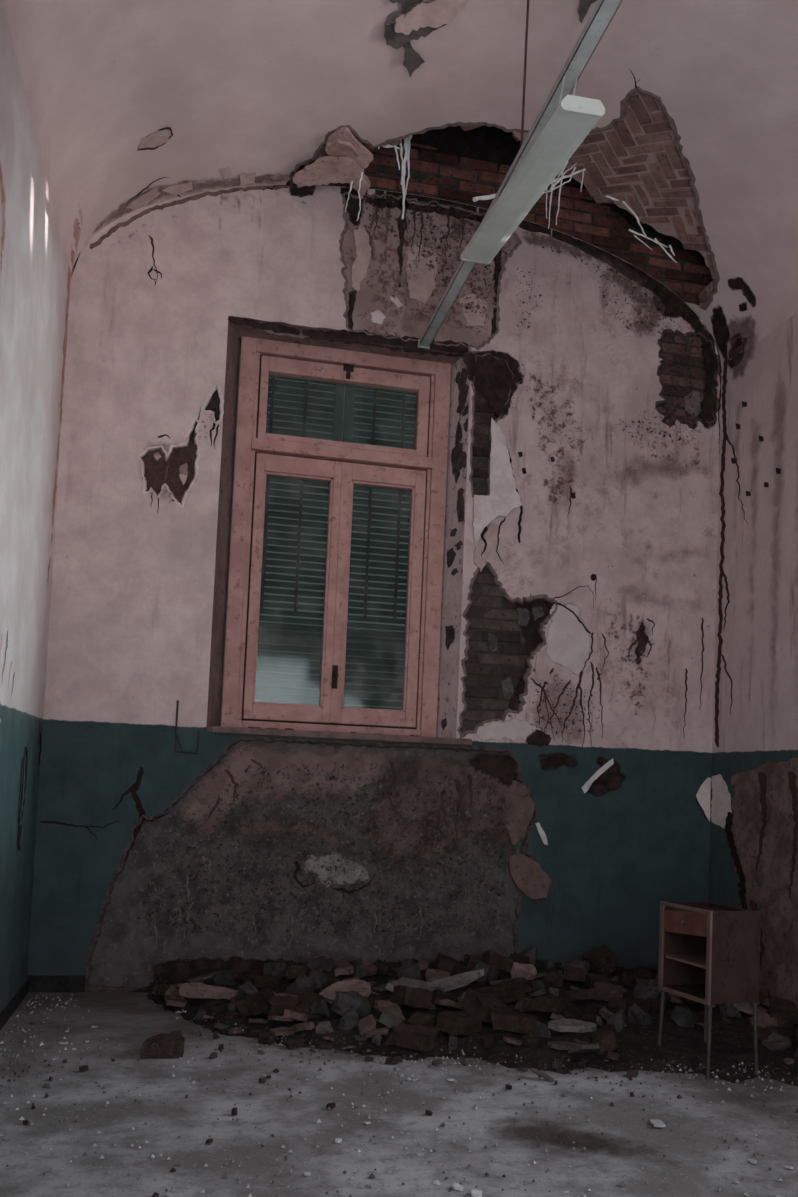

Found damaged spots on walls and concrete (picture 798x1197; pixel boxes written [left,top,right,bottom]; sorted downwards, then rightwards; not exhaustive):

peeling [384,0,469,77]
peeling [578,0,597,24]
spalling [524,86,720,310]
rust [60,222,80,422]
spalling [655,329,721,430]
spalling [85,122,595,992]
water stain [476,614,652,748]
water stain [683,617,704,737]
peeling [582,757,626,796]
spalling [696,756,798,1009]